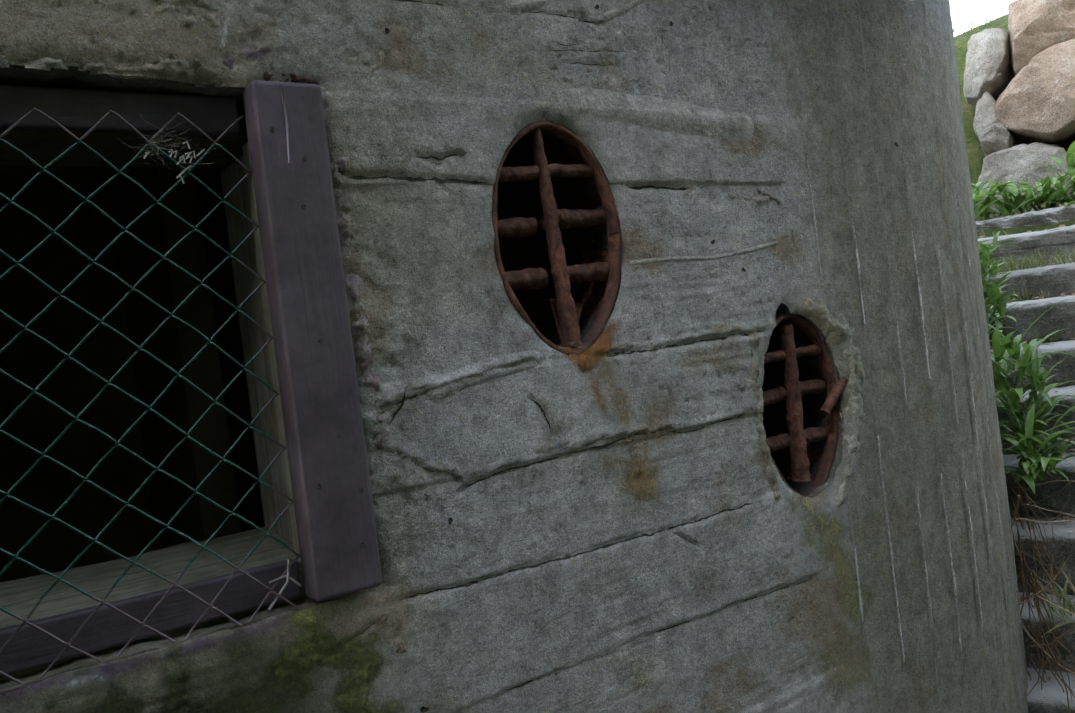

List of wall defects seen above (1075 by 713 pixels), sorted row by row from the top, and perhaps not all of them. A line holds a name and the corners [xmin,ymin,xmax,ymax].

spalling [747,325,781,500]
spalling [795,295,865,507]